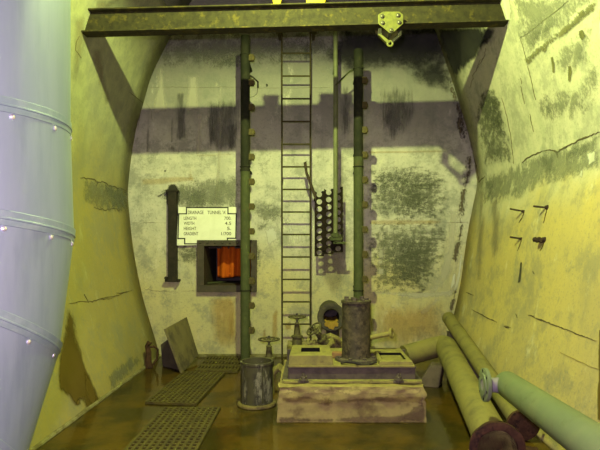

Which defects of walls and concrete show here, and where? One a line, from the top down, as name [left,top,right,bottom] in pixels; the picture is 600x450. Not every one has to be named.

water stain [515,0,587,45]
mould [557,41,583,67]
mould [477,90,599,202]
crack [502,100,599,164]
water stain [369,167,456,297]
crack [69,290,132,304]
crack [466,292,595,341]
water stain [59,313,98,407]